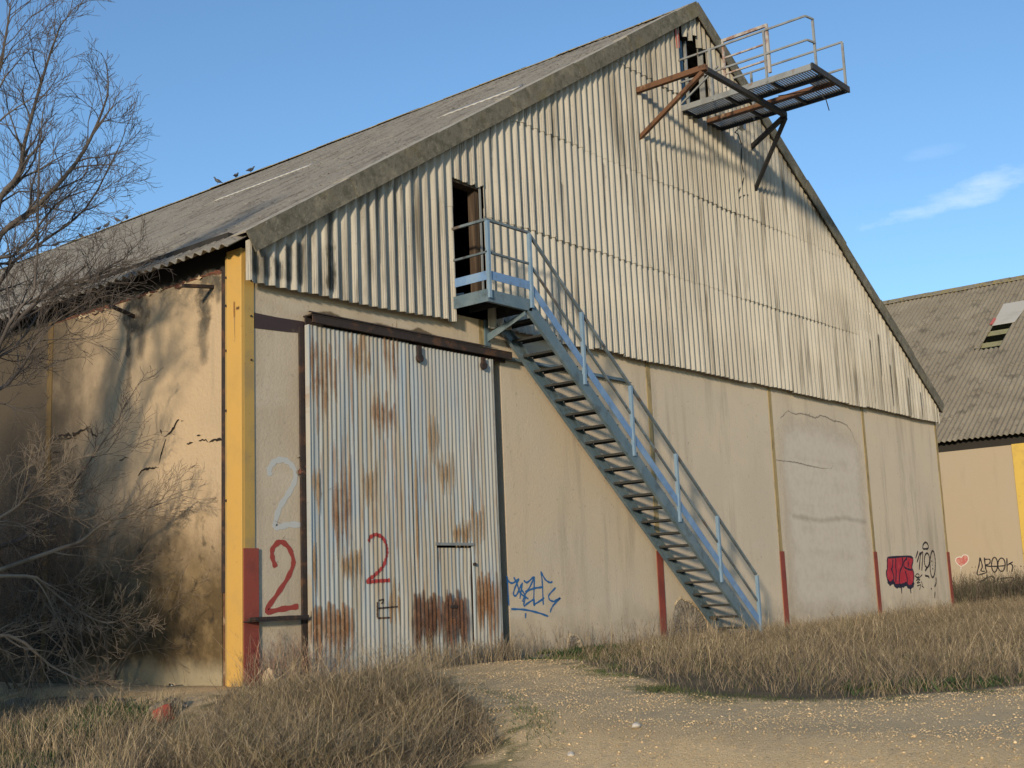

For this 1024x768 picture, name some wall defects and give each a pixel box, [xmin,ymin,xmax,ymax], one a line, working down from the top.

leakage [198,271,221,355]
crack [52,419,221,476]
rust [373,393,395,439]
rust [429,413,451,493]
rust [390,460,503,663]
rust [309,602,353,662]